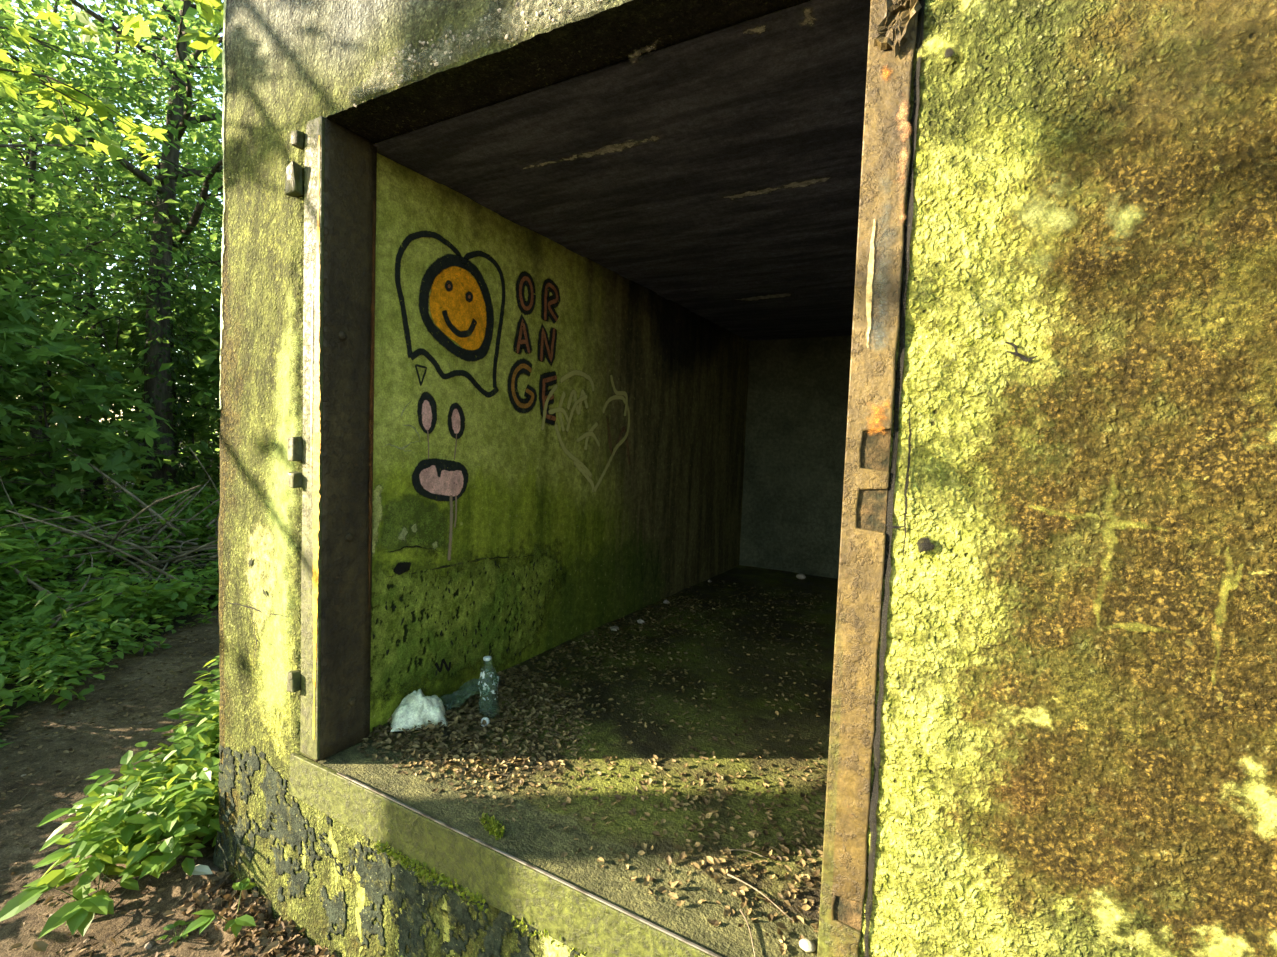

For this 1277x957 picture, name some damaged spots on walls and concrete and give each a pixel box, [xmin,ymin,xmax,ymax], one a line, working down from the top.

water stain [948,82,1277,957]
water stain [329,828,365,953]
water stain [441,894,455,957]
water stain [542,933,585,957]